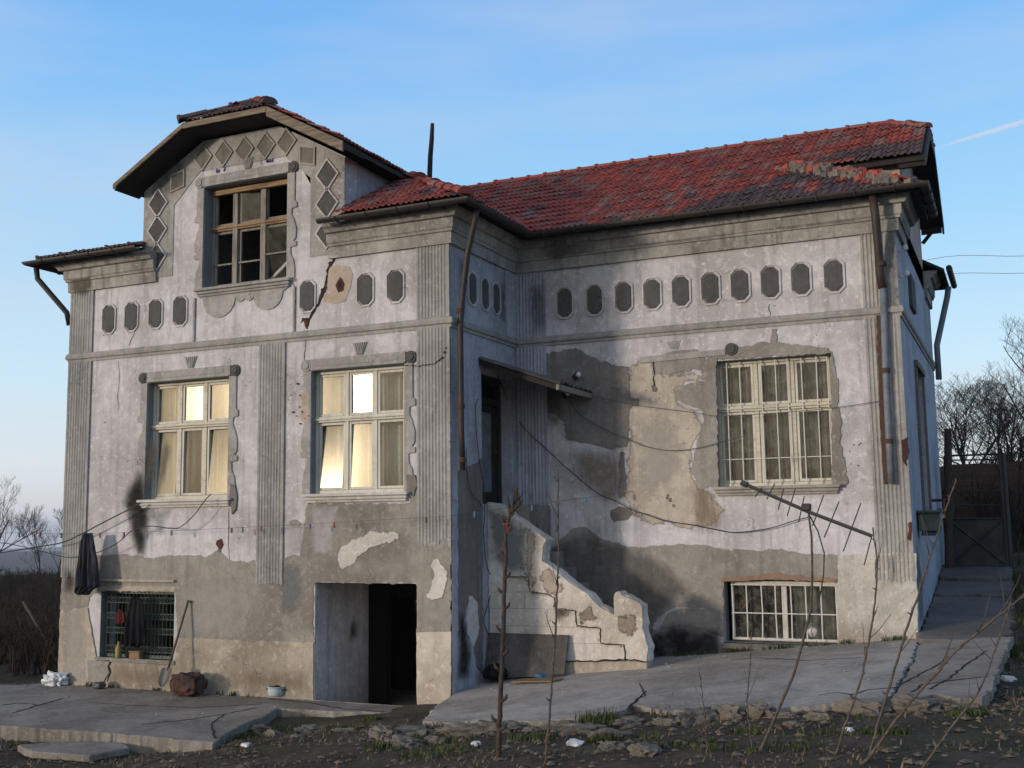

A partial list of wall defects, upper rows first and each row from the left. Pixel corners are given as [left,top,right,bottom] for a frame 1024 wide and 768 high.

spalling [774,160,924,188]
crack [295,259,335,360]
corrosion [876,315,888,484]
flaking render [625,362,725,529]
spalling [337,530,399,569]
spalling [426,558,452,603]
spalling [524,529,564,607]
crack [510,576,646,663]
spalling [579,606,597,625]
spalling [618,614,638,647]